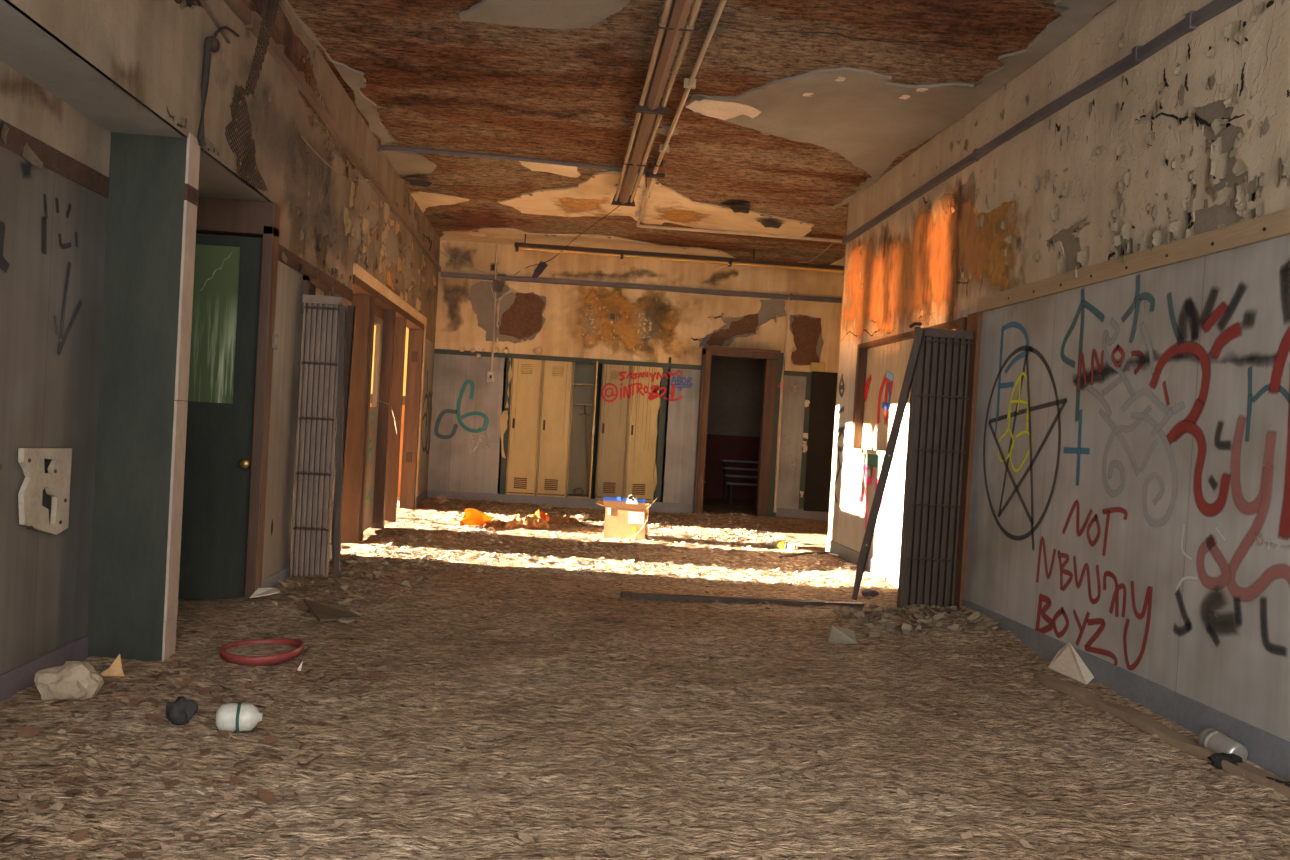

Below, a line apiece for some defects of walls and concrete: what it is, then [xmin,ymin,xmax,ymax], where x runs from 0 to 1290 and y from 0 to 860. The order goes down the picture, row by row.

spalling [174,0,201,10]
peeling [241,0,361,168]
peeling [685,95,761,120]
peeling [994,63,1270,273]
peeling [300,193,443,311]
spalling [469,280,546,344]
spalling [699,299,825,366]